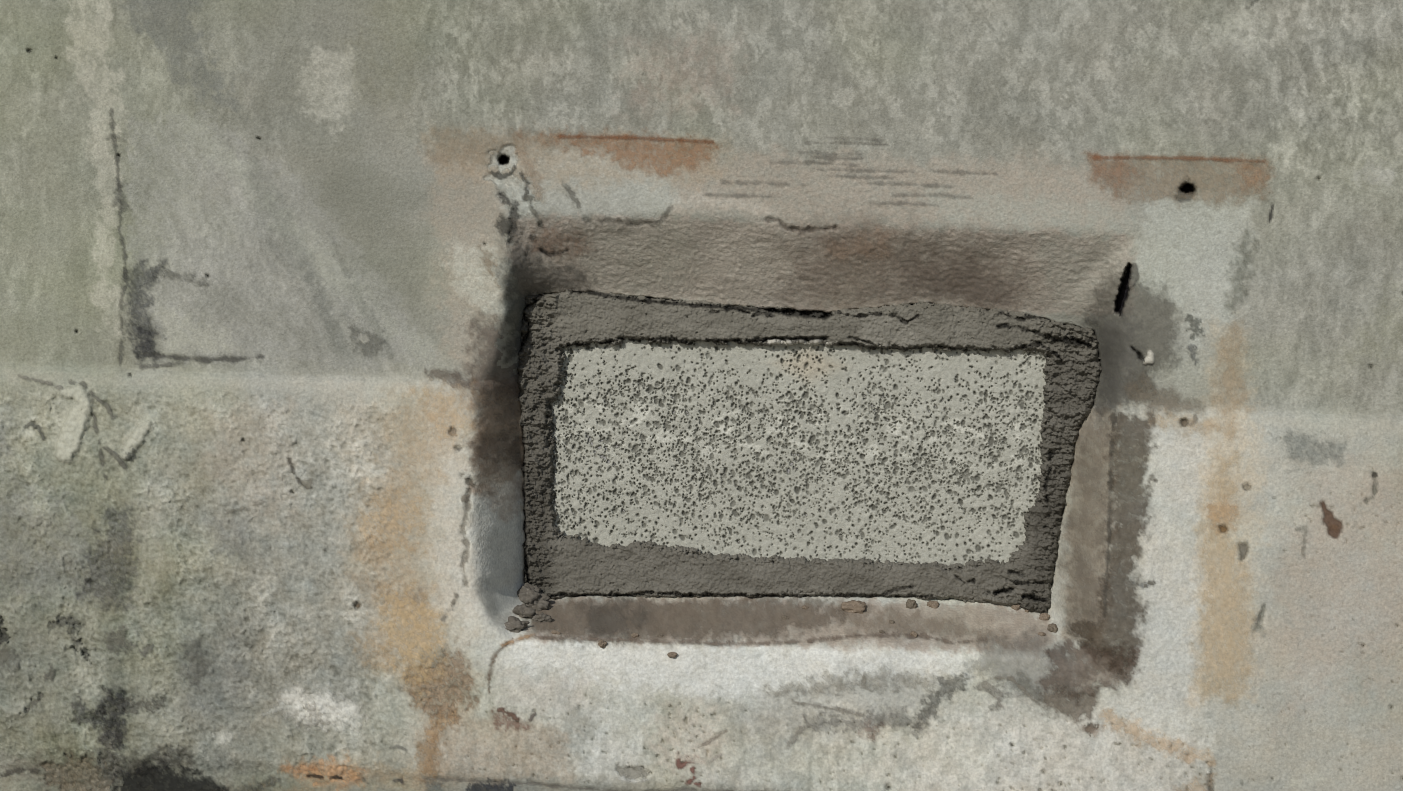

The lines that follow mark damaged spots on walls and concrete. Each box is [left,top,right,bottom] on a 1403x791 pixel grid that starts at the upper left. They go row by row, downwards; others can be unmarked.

corrosion [518,133,717,176]
corrosion [1088,155,1269,203]
water stain [1226,230,1259,306]
water stain [526,277,1202,741]
water stain [71,687,279,791]